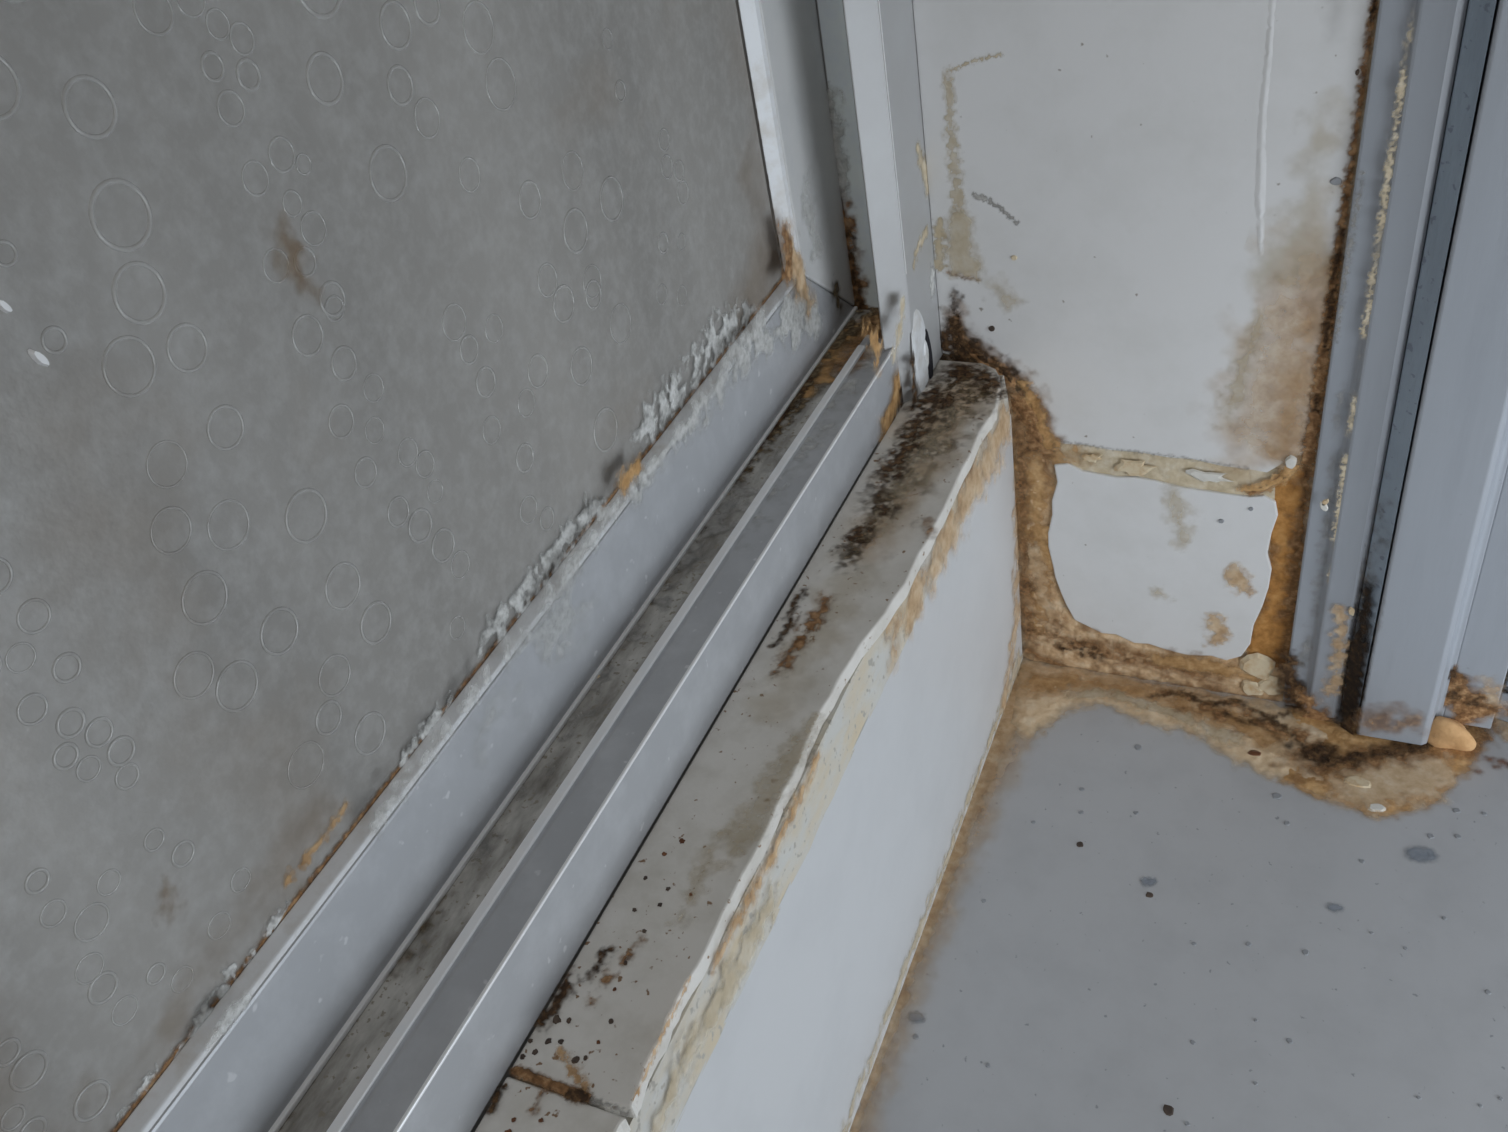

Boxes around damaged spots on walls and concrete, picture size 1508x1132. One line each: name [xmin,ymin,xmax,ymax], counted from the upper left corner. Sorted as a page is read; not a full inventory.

water stain [934,53,1019,280]
water stain [653,751,820,1132]
water stain [843,405,1328,1132]